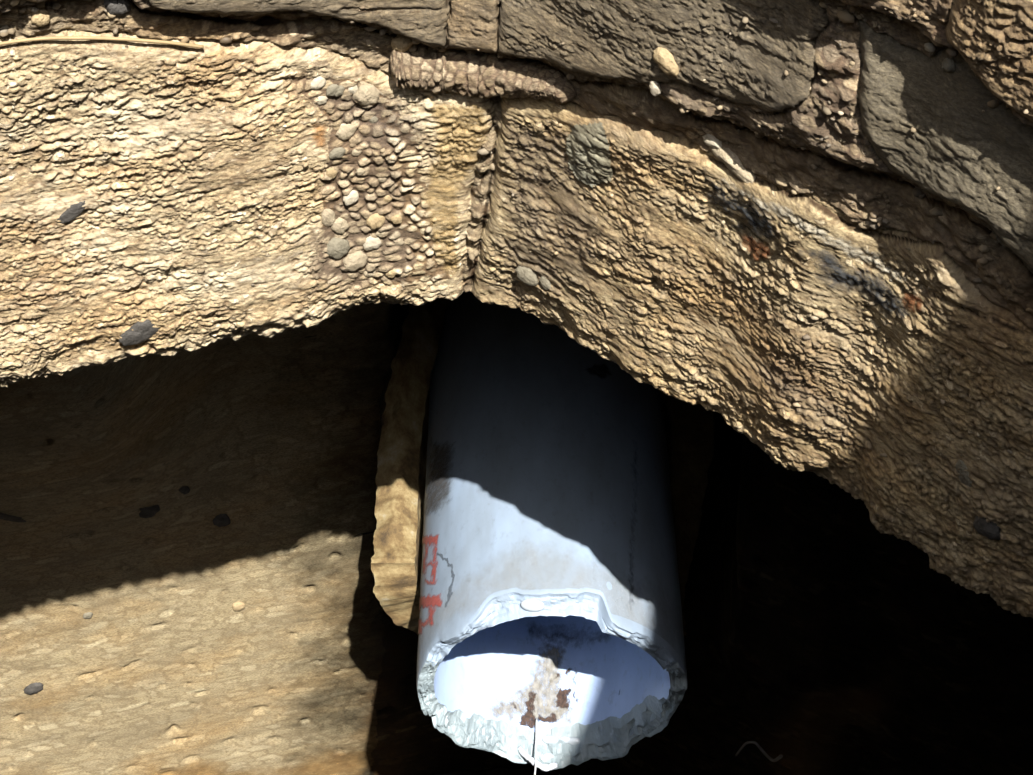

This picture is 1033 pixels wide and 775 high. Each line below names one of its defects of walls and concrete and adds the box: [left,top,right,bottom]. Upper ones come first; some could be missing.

water stain [314,411,1033,775]